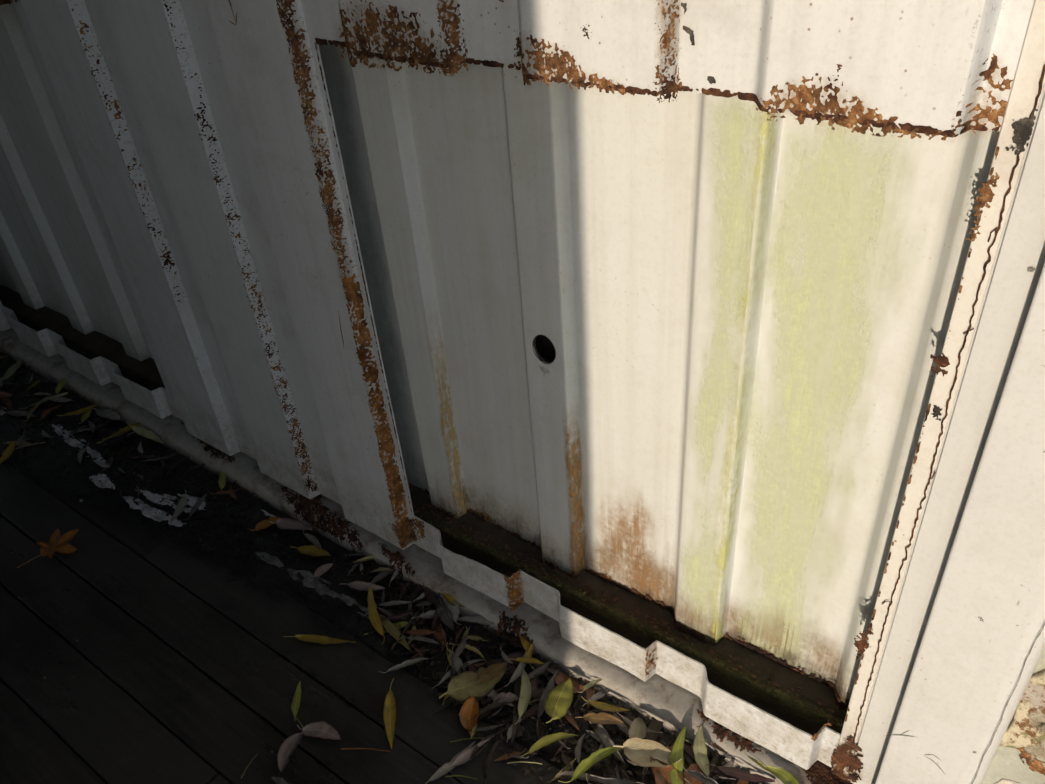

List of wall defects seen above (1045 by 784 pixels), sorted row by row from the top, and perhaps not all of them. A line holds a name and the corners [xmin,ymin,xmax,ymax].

corrosion [72,0,184,305]
corrosion [163,0,364,551]
water stain [0,363,655,784]
corrosion [425,432,850,722]
corrosion [276,0,1013,581]
corrosion [803,737,863,784]
corrosion [854,610,876,685]
crack [847,65,1045,784]